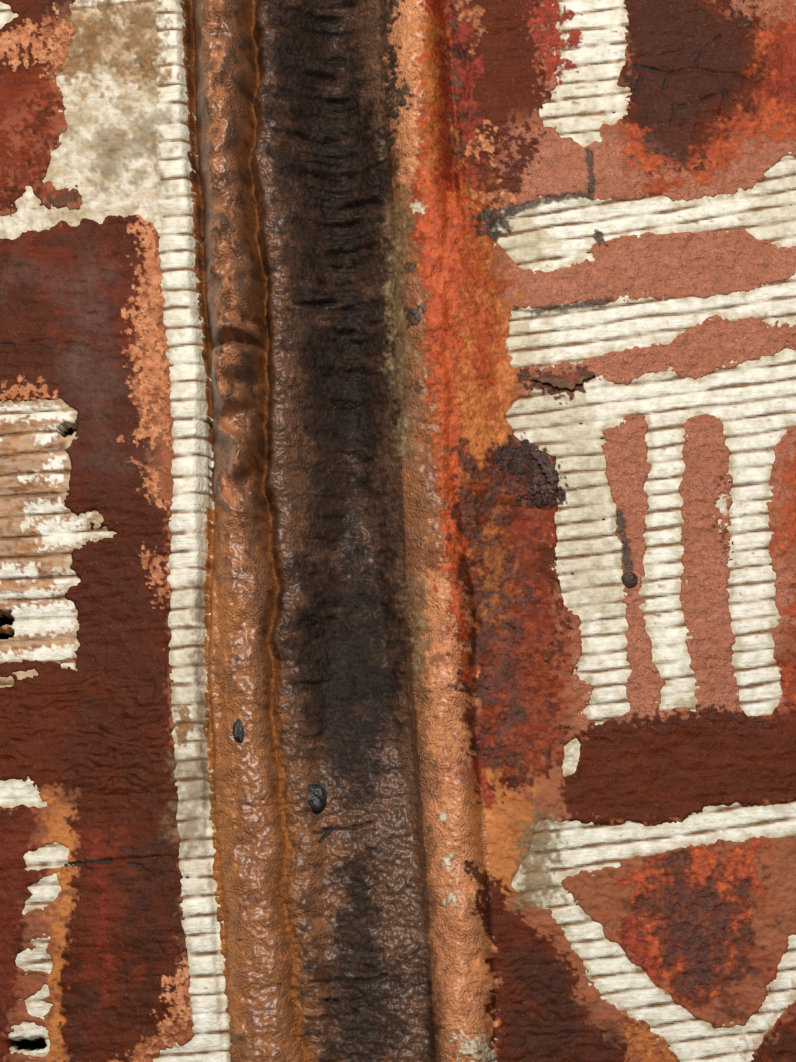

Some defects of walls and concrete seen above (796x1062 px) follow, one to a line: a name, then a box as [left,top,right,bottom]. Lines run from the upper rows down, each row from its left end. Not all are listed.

crack [633,63,689,109]
rust [616,3,796,195]
damp [330,65,426,466]
rust [410,0,565,808]
peeling [0,0,232,1062]
damp [287,328,434,686]
rust [769,449,796,556]
peeling [562,738,581,777]
rust [777,660,796,706]
damp [336,847,380,975]
peeling [512,800,796,1062]
rust [597,838,771,1019]